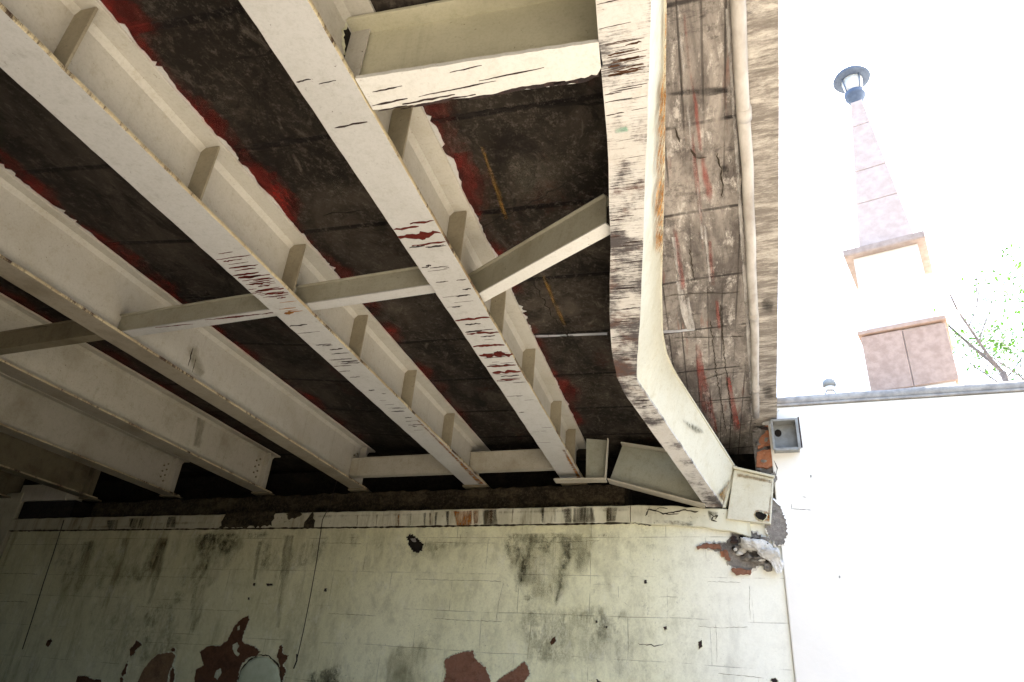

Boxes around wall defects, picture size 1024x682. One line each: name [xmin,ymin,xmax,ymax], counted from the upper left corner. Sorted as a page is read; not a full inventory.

crack [675,128,724,198]
crack [631,507,718,526]
hole [406,533,424,553]
leakage [506,534,571,601]
spalling [696,530,784,576]
peeling [119,639,177,682]
peeling [194,615,261,682]
peeling [277,644,289,681]
peeling [443,650,531,682]